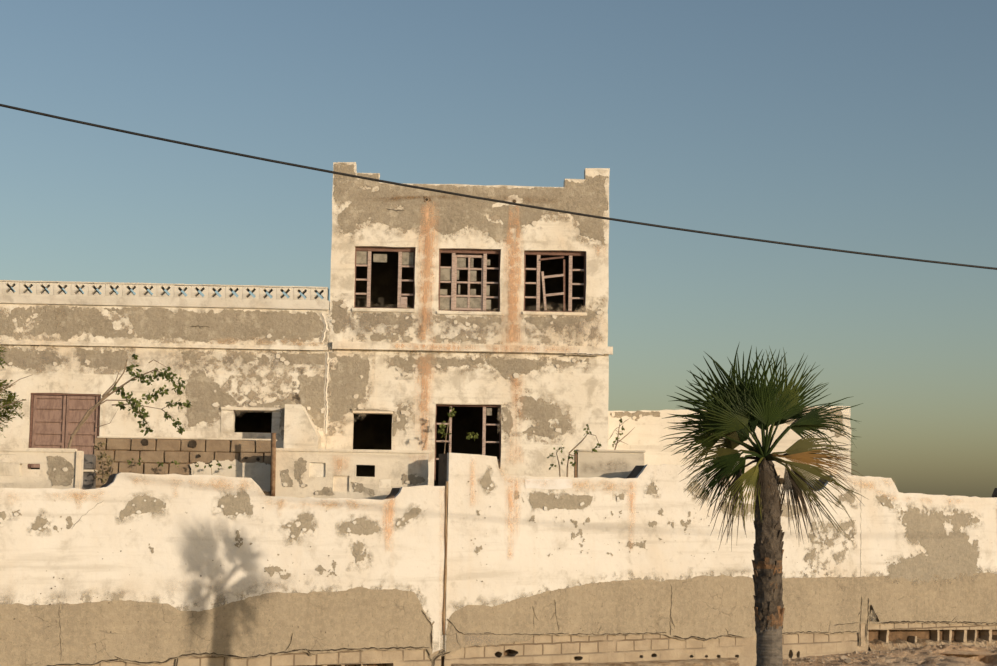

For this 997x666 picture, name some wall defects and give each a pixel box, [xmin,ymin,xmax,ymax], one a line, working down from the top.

peeling [333,163,609,247]
rust [419,208,459,349]
rust [506,209,521,342]
peeling [0,300,589,444]
peeling [46,455,75,486]
peeling [0,554,433,666]
peeling [189,440,334,518]
crack [45,584,743,666]
peeling [514,491,593,558]
peeling [442,571,757,655]
peeling [781,494,997,651]
crack [782,496,997,646]